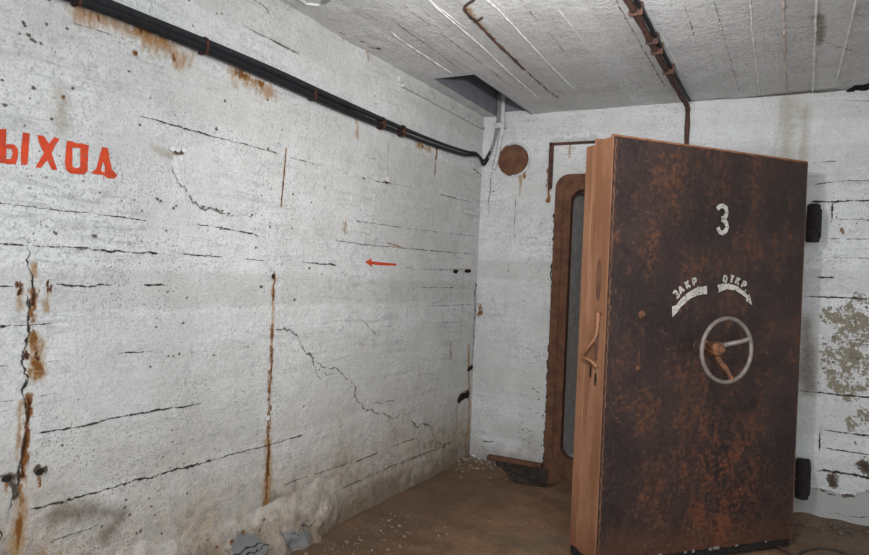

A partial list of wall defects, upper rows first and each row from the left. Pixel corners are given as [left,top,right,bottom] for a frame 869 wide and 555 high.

rust [74,7,185,68]
rust [463,0,558,99]
crack [141,116,322,205]
crack [0,203,146,221]
crack [198,224,278,237]
rust [15,279,52,380]
crack [335,219,476,358]
crack [0,237,459,539]
peeling [819,292,869,476]
rust [13,393,33,555]
spalling [230,518,268,555]
peeling [793,473,869,526]